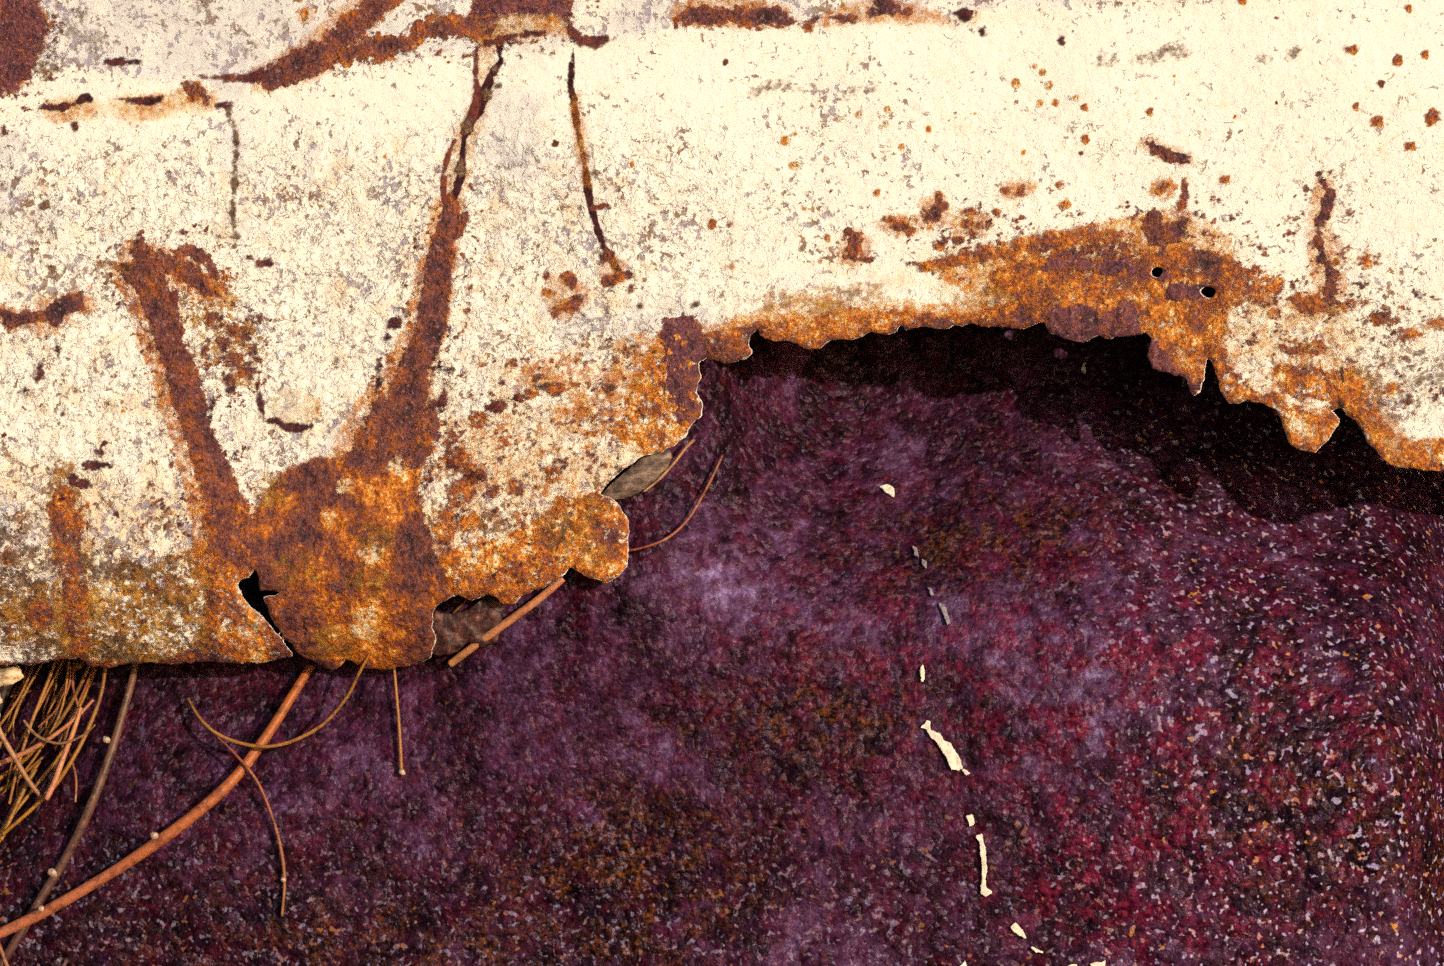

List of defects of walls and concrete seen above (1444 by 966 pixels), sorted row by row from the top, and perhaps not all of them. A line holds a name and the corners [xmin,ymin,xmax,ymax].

rust [0,0,120,135]
rust [198,0,609,94]
rust [1137,37,1193,65]
rust [1256,47,1302,64]
rust [753,79,816,97]
rust [836,86,876,122]
rust [1033,64,1088,111]
rust [1353,102,1384,127]
rust [1424,107,1441,127]
crack [568,48,634,293]
rust [0,137,1444,670]